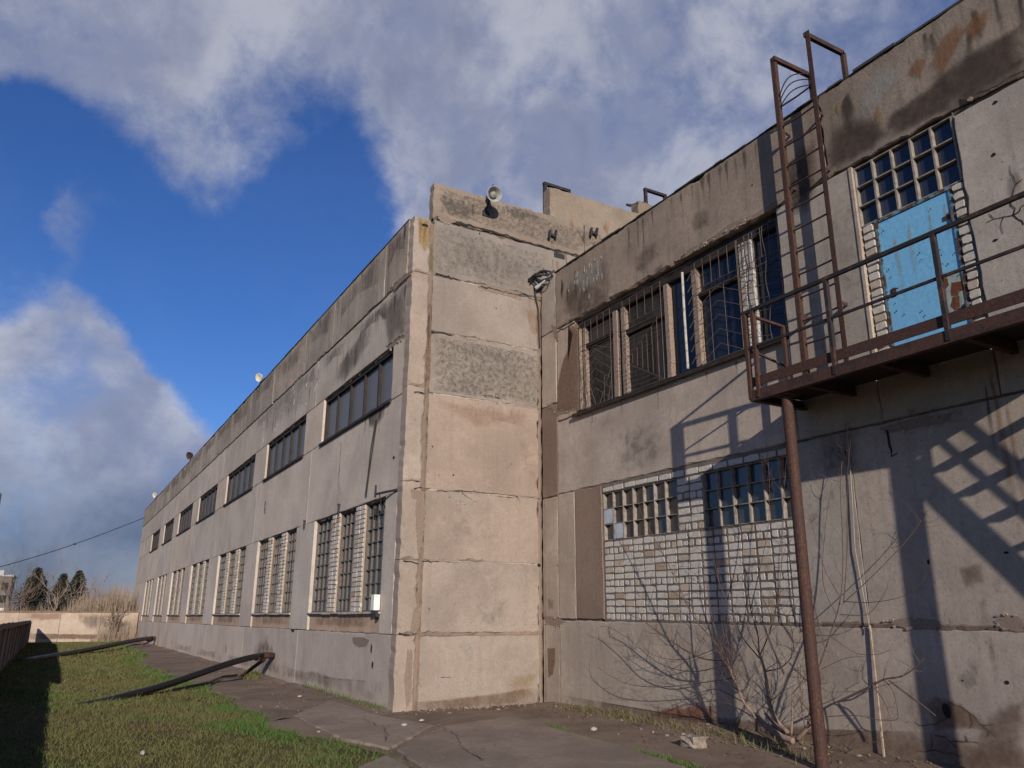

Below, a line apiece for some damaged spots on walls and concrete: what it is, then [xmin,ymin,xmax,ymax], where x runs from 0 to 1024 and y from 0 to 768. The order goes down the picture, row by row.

leakage [891,33,1020,130]
leakage [833,96,881,162]
crack [986,171,1024,233]
corrosion [419,221,429,247]
leakage [337,335,361,374]
crack [886,430,897,457]
spalling [352,635,368,647]